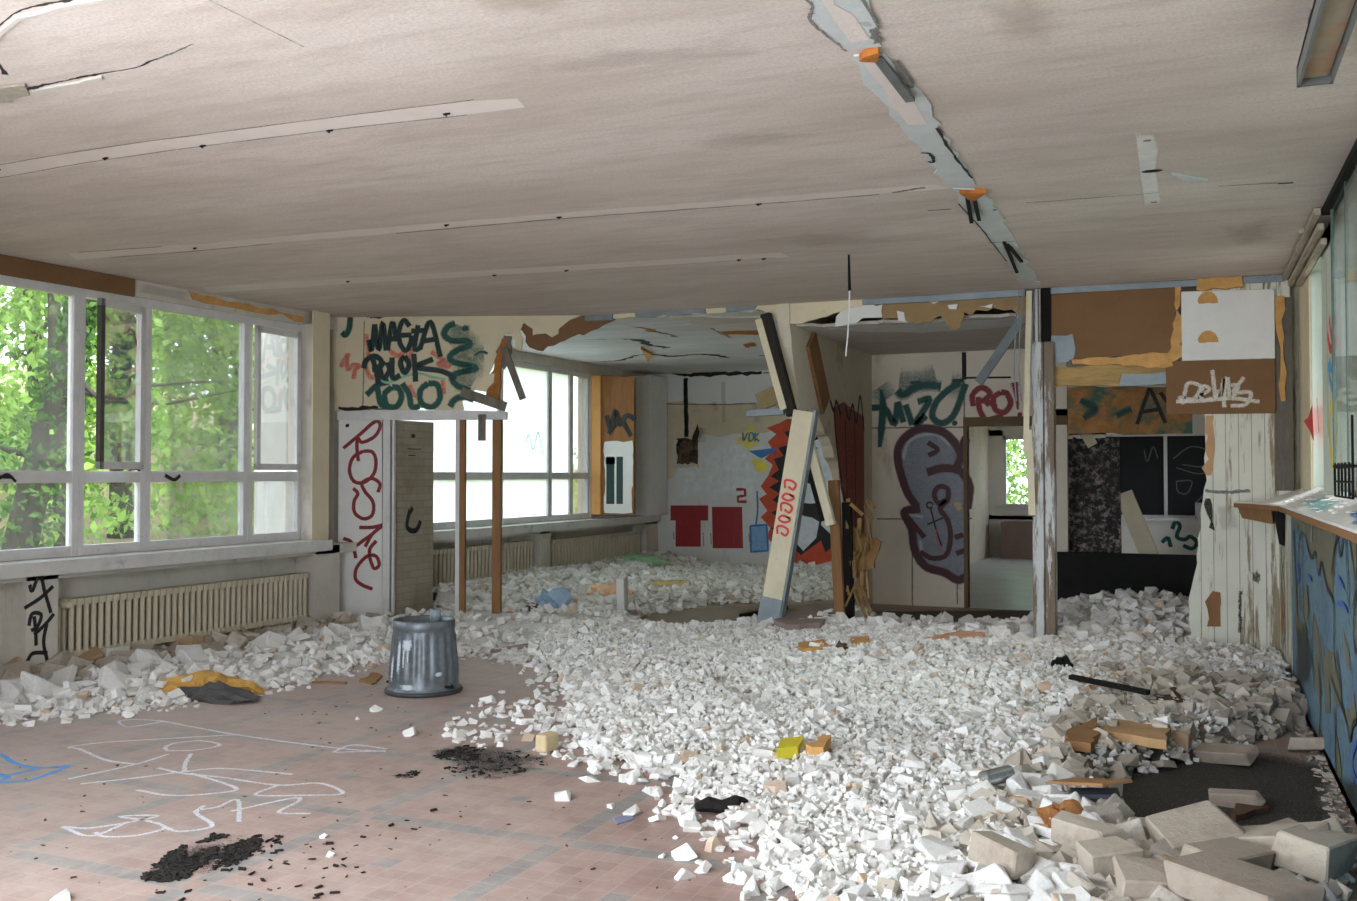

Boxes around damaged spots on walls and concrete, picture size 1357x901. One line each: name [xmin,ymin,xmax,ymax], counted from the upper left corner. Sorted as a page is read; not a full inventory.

crack [0,0,193,103]
peeling [805,0,1040,285]
peeling [668,315,760,348]
peeling [829,304,1018,333]
peeling [1202,416,1250,531]
peeling [1205,591,1221,627]